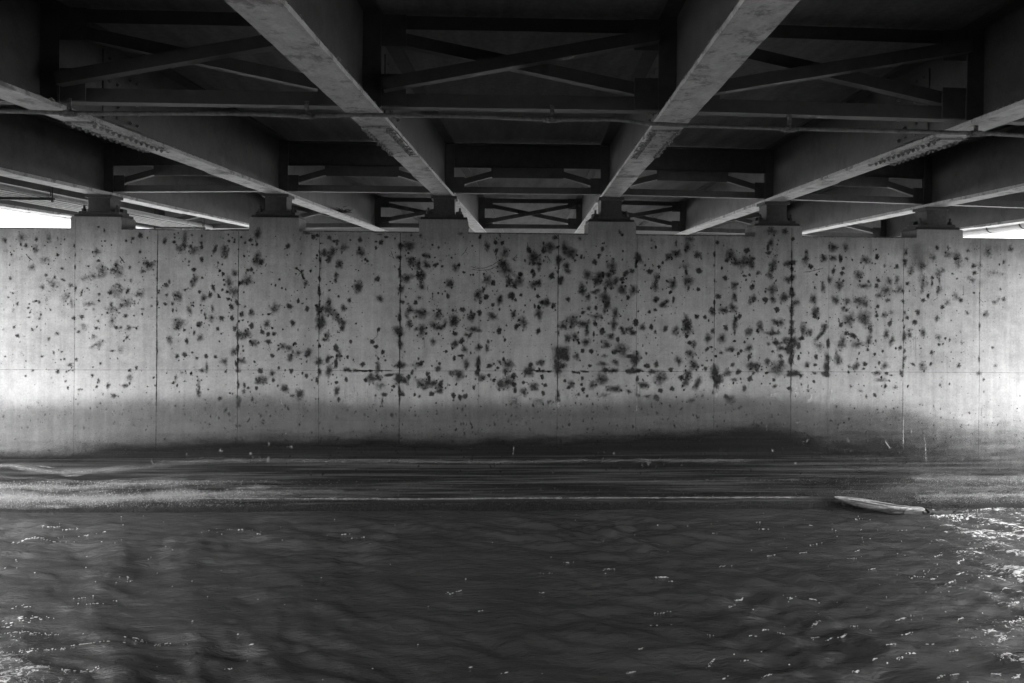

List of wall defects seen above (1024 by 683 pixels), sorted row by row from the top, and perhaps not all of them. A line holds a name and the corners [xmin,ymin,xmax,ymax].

damp [0,226,1024,513]